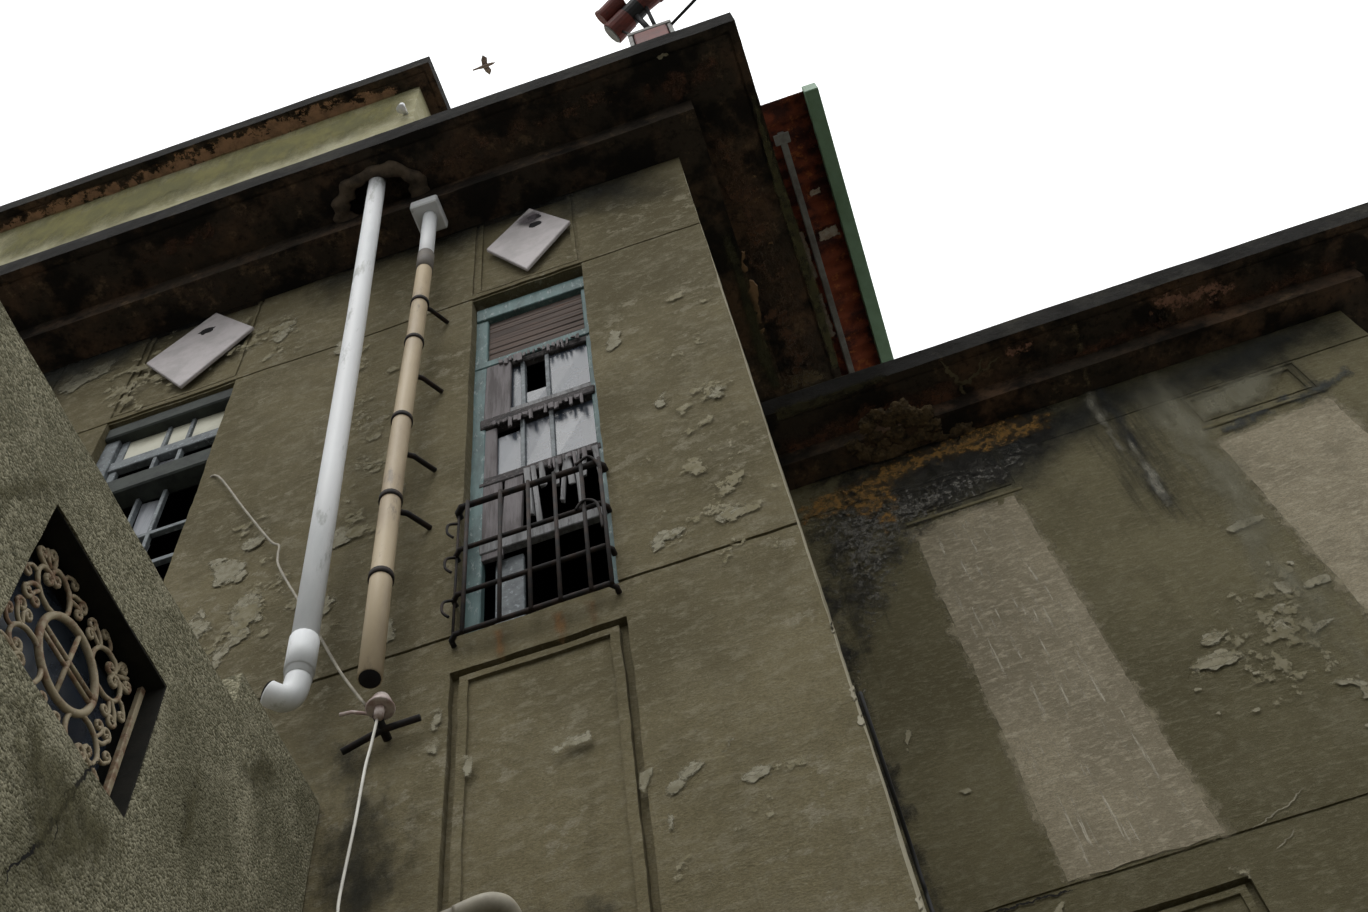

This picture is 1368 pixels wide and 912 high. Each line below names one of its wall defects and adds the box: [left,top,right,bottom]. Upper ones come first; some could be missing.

peeling [57,331,186,413]
peeling [210,307,308,369]
peeling [606,330,621,351]
peeling [651,330,776,569]
water stain [1071,324,1168,498]
peeling [188,514,297,669]
water stain [809,446,1028,692]
peeling [1189,554,1368,716]
peeling [639,761,709,831]